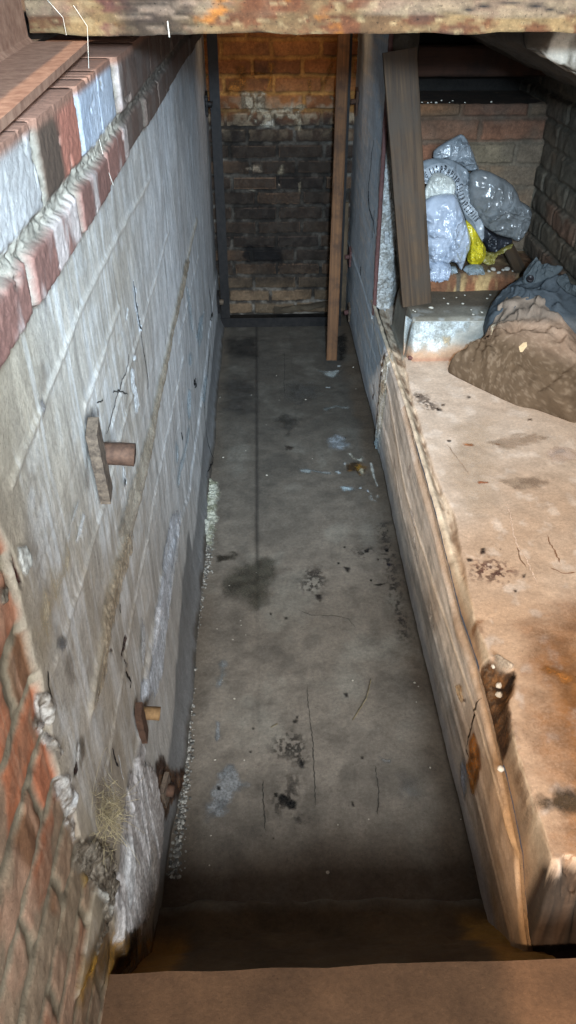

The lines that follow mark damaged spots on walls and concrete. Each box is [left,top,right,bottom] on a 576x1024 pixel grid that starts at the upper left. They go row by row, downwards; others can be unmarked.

crack [97,280,148,434]
efflorescence [205,478,219,544]
water stain [217,553,274,607]
spalling [34,693,64,758]
rust [466,733,481,793]
spalling [52,743,120,955]